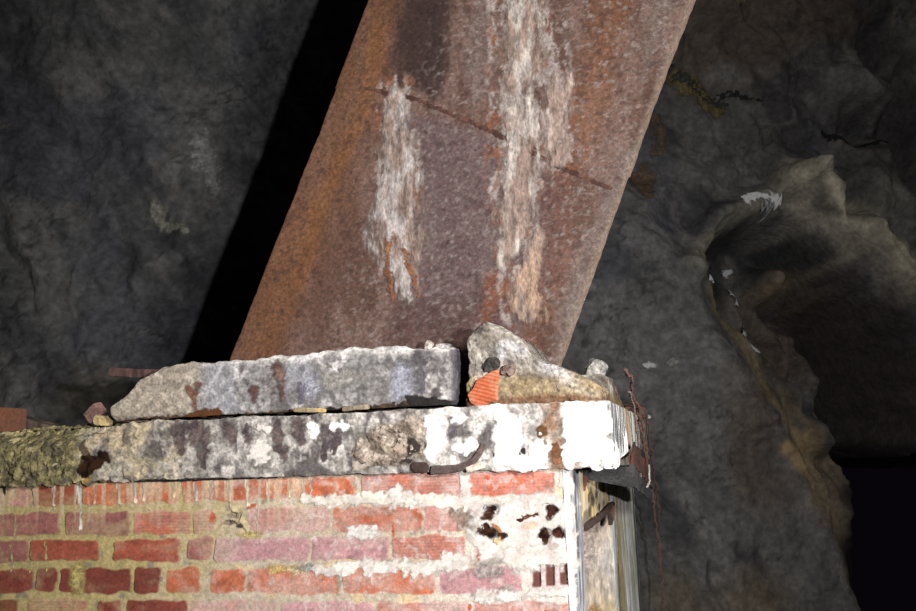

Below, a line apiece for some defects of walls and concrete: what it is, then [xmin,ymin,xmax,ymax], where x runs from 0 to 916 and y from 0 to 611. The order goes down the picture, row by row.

damp [363,87,425,301]
rust [382,231,421,301]
damp [490,0,575,323]
damp [267,401,641,611]
spalling [477,505,507,545]
spalling [517,503,565,550]